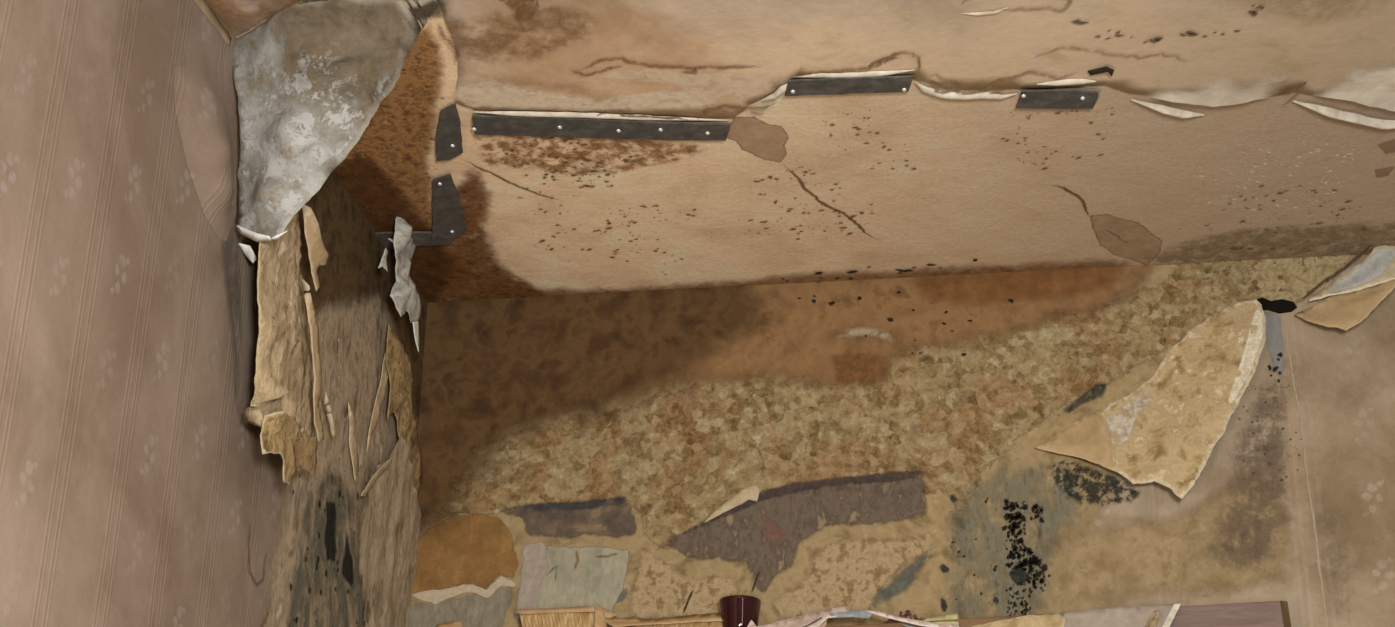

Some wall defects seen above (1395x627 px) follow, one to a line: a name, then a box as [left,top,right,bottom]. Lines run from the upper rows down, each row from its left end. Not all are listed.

water stain [409,0,584,61]
crack [786,167,876,239]
water stain [290,455,371,627]
water stain [298,167,1395,532]
peeling [409,214,1350,627]
water stain [876,461,1139,619]
water stain [1224,371,1302,562]